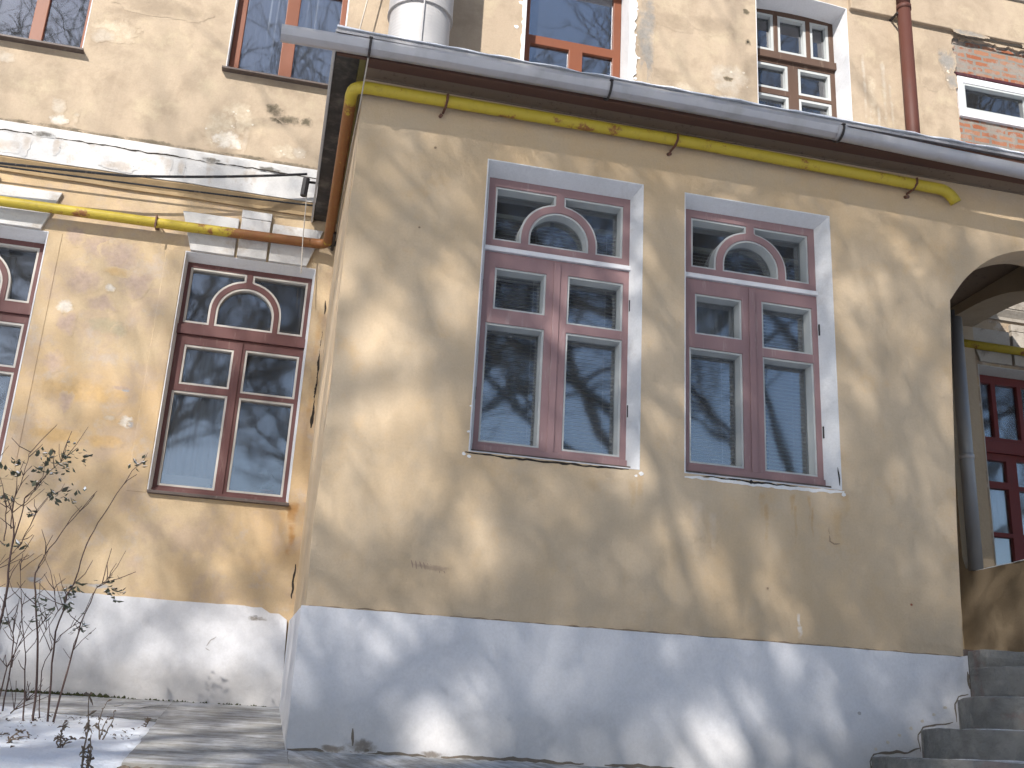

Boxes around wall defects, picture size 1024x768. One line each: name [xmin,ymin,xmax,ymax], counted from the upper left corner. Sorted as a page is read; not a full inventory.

peeling [203,101,254,154]
leakage [260,103,313,143]
flaking render [937,28,1024,153]
crack [310,300,326,428]